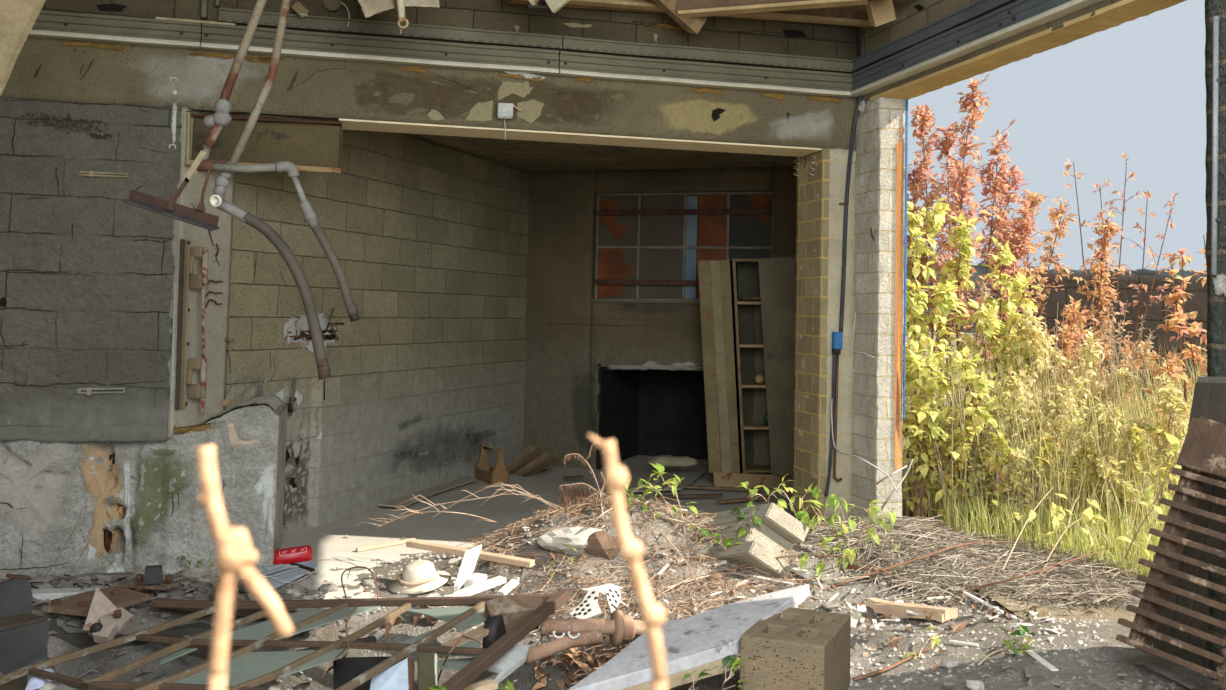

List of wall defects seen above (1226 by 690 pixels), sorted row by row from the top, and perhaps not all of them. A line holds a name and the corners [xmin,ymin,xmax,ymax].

peeling [427,109,444,120]
peeling [465,71,546,124]
spalling [687,88,726,121]
crack [0,270,92,280]
crack [0,316,164,387]
crack [0,537,65,570]